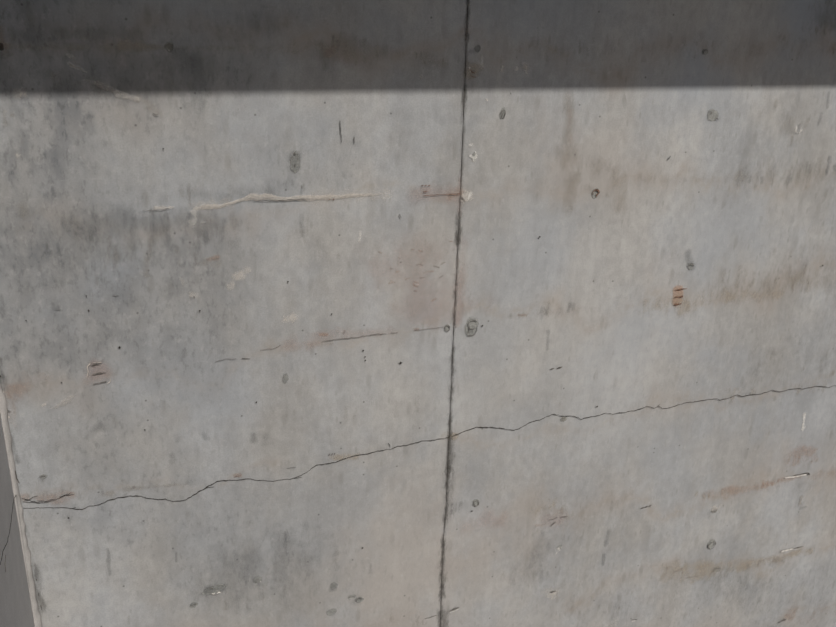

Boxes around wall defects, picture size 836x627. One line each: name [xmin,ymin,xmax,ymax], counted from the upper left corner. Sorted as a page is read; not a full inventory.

crack [0,385,836,572]